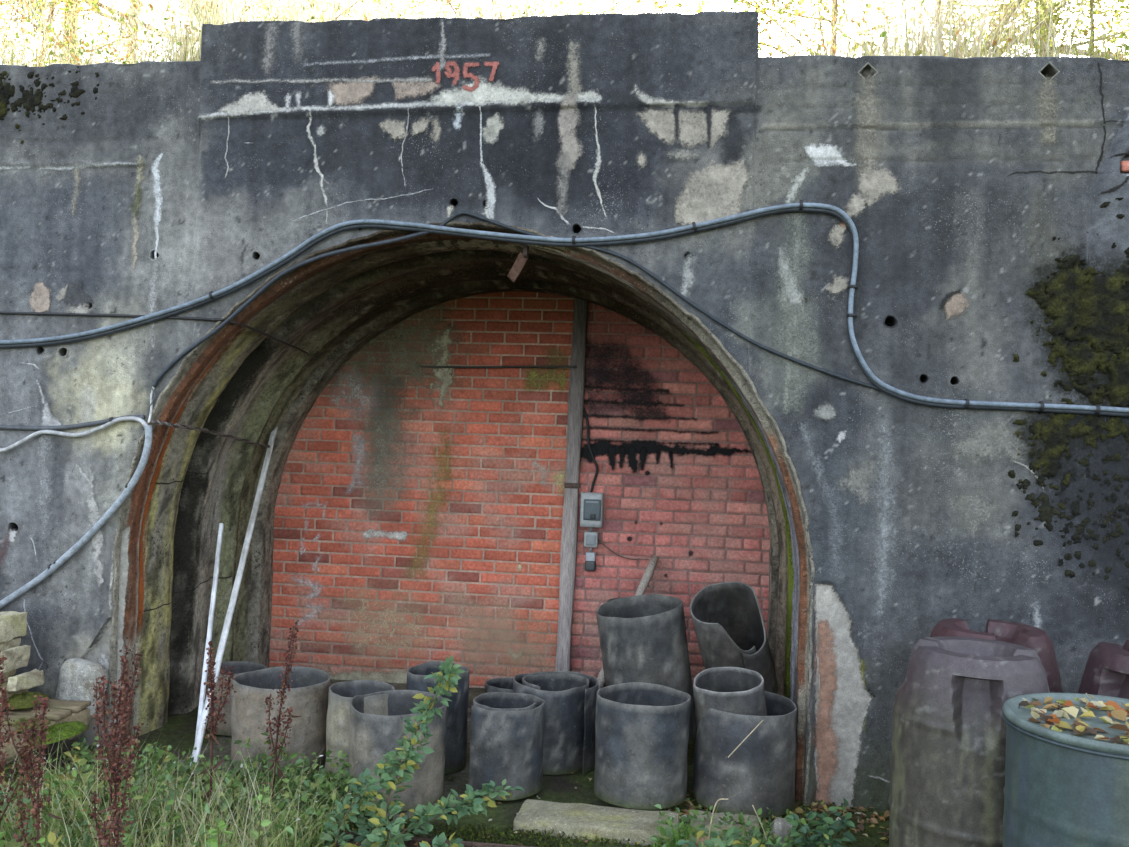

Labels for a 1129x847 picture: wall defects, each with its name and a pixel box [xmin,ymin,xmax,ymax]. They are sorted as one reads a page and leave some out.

peeling [330,77,380,105]
crack [291,108,425,224]
peeling [393,79,439,99]
crack [479,107,496,218]
crack [538,107,614,233]
peeling [640,104,748,225]
peeling [805,145,899,246]
crack [1009,63,1129,194]
peeling [826,277,848,293]
water stain [581,385,752,459]
rust [0,530,17,564]
spalling [814,584,872,807]